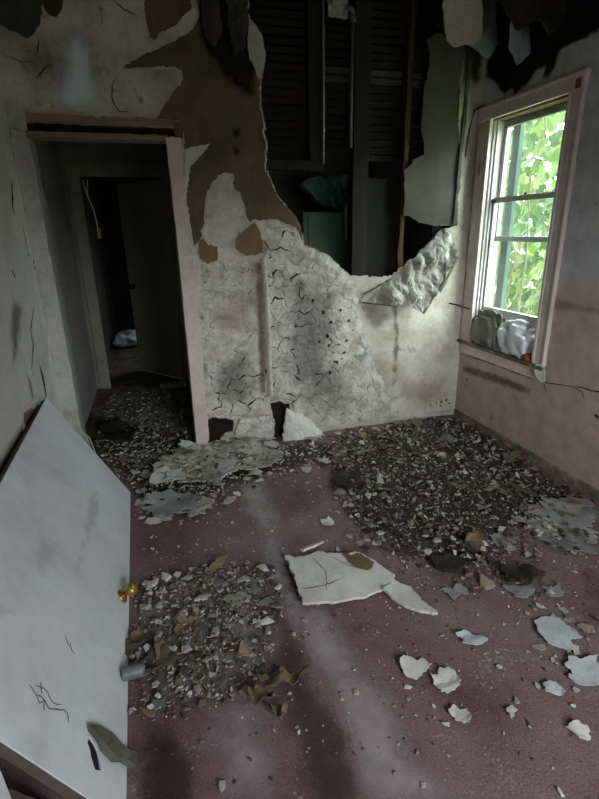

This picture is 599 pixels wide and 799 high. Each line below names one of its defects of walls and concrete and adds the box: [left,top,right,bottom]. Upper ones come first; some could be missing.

crack [0,41,52,78]
peeling [123,0,302,264]
leakage [368,305,399,371]
crack [465,355,599,398]
spalling [208,414,235,442]
spalling [270,399,292,452]